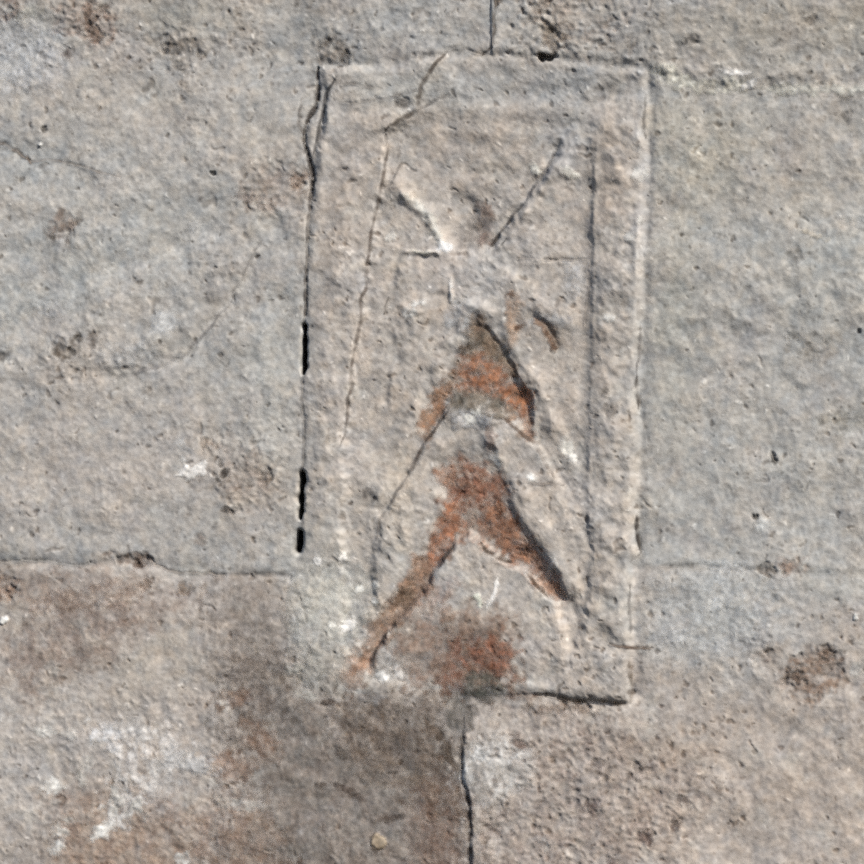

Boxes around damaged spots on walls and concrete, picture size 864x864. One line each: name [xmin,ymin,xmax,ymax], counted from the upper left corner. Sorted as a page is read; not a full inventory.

crack [482,0,500,56]
crack [301,68,372,375]
crack [367,55,444,264]
crack [416,412,447,460]
corrosion [422,316,532,440]
corrosion [534,317,557,349]
crack [296,454,306,552]
corrosion [354,456,559,669]
corrosion [400,613,513,697]
damp [265,707,454,864]